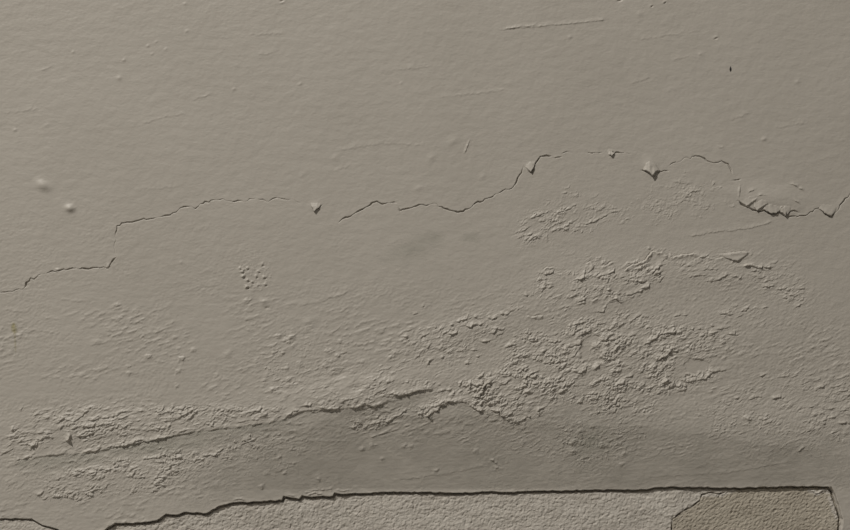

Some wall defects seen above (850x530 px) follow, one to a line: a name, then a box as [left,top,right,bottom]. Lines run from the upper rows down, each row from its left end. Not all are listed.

crack [336,149,634,226]
crack [659,154,743,199]
crack [0,196,303,295]
peeling [0,181,850,510]
flaking render [0,516,62,530]
flaking render [101,483,845,530]